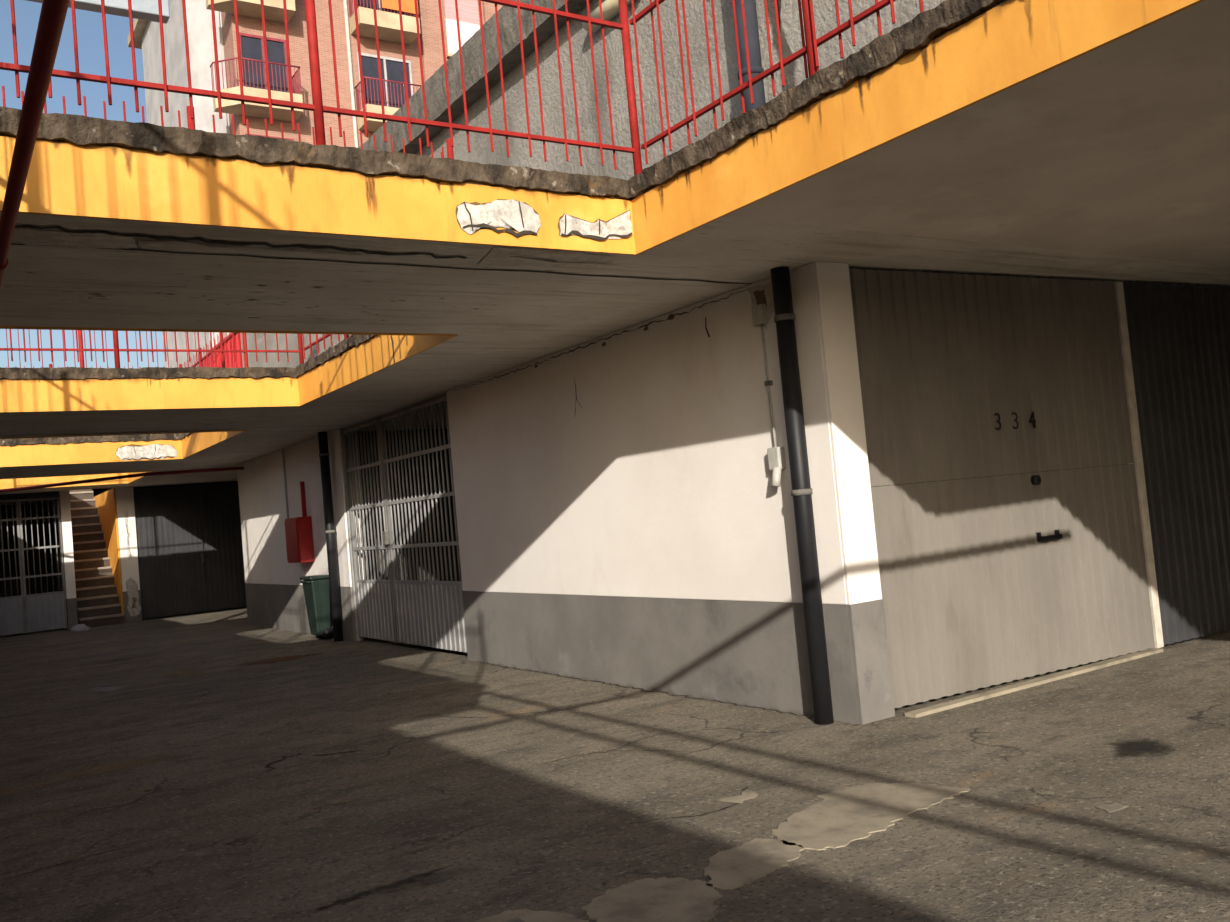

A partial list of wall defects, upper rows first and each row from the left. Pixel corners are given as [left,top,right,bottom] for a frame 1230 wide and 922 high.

leakage [767,0,795,91]
crack [15,226,466,259]
peeling [456,199,632,267]